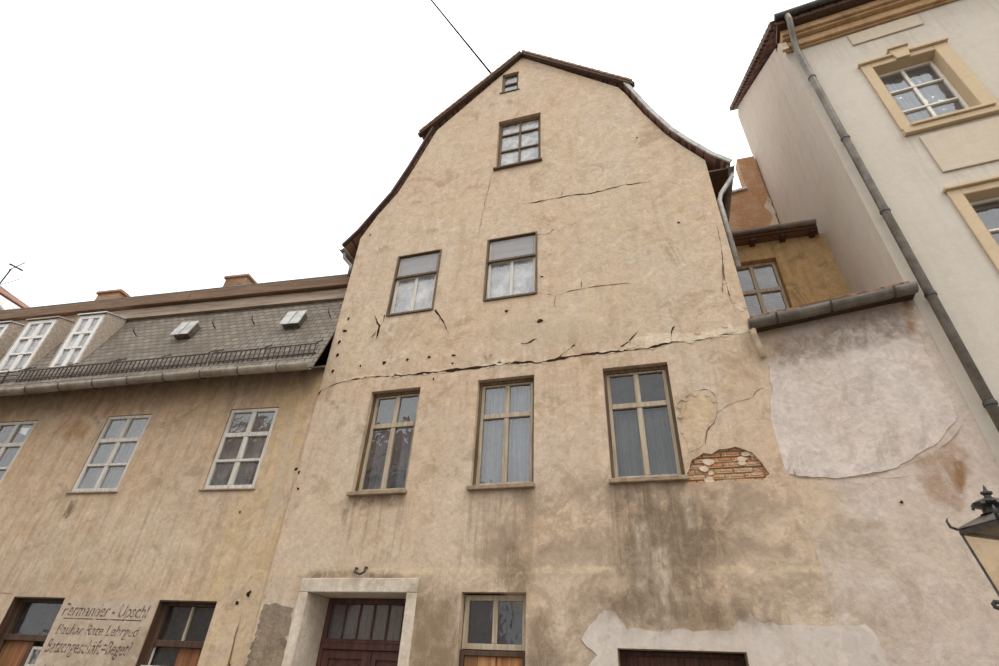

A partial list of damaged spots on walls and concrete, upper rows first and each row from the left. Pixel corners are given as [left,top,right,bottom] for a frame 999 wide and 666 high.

crack [523,181,651,204]
crack [543,282,628,305]
crack [717,227,732,302]
crack [318,326,737,395]
crack [680,388,763,447]
spalling [677,391,769,483]
spalling [245,603,293,666]